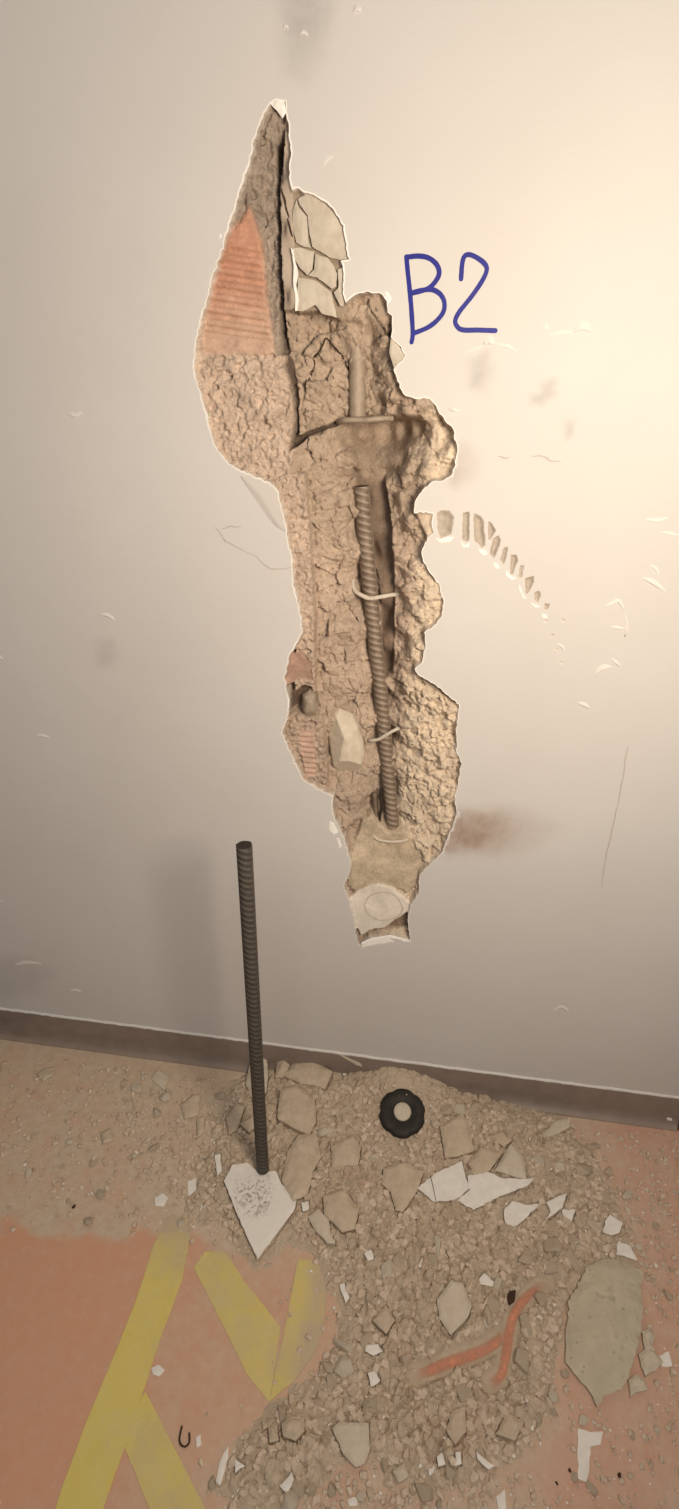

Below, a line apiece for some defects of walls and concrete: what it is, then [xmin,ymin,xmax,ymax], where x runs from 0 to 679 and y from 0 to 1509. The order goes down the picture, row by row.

spalling [192,98,566,949]